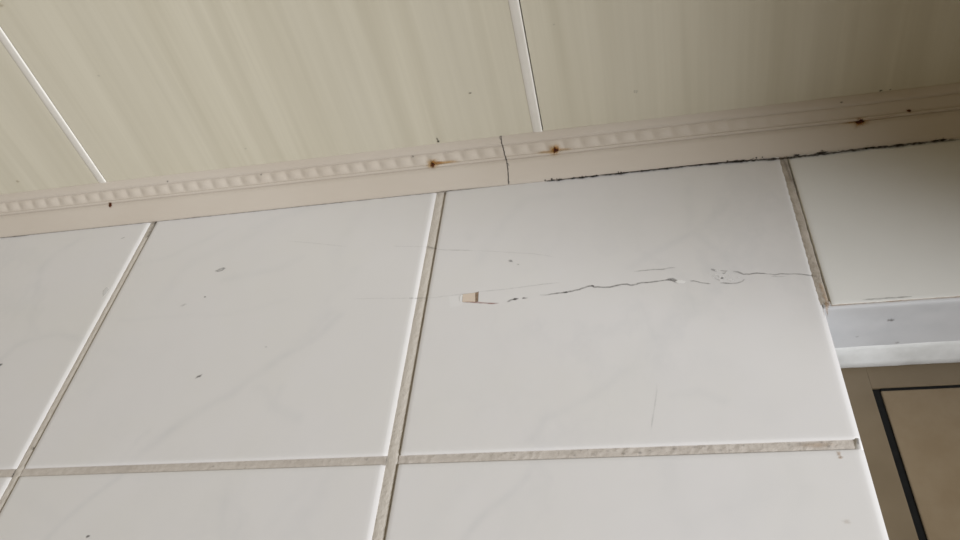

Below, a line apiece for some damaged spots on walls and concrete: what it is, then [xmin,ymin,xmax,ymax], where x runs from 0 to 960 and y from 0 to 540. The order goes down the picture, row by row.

water stain [545,139,953,181]
spalling [448,292,495,308]